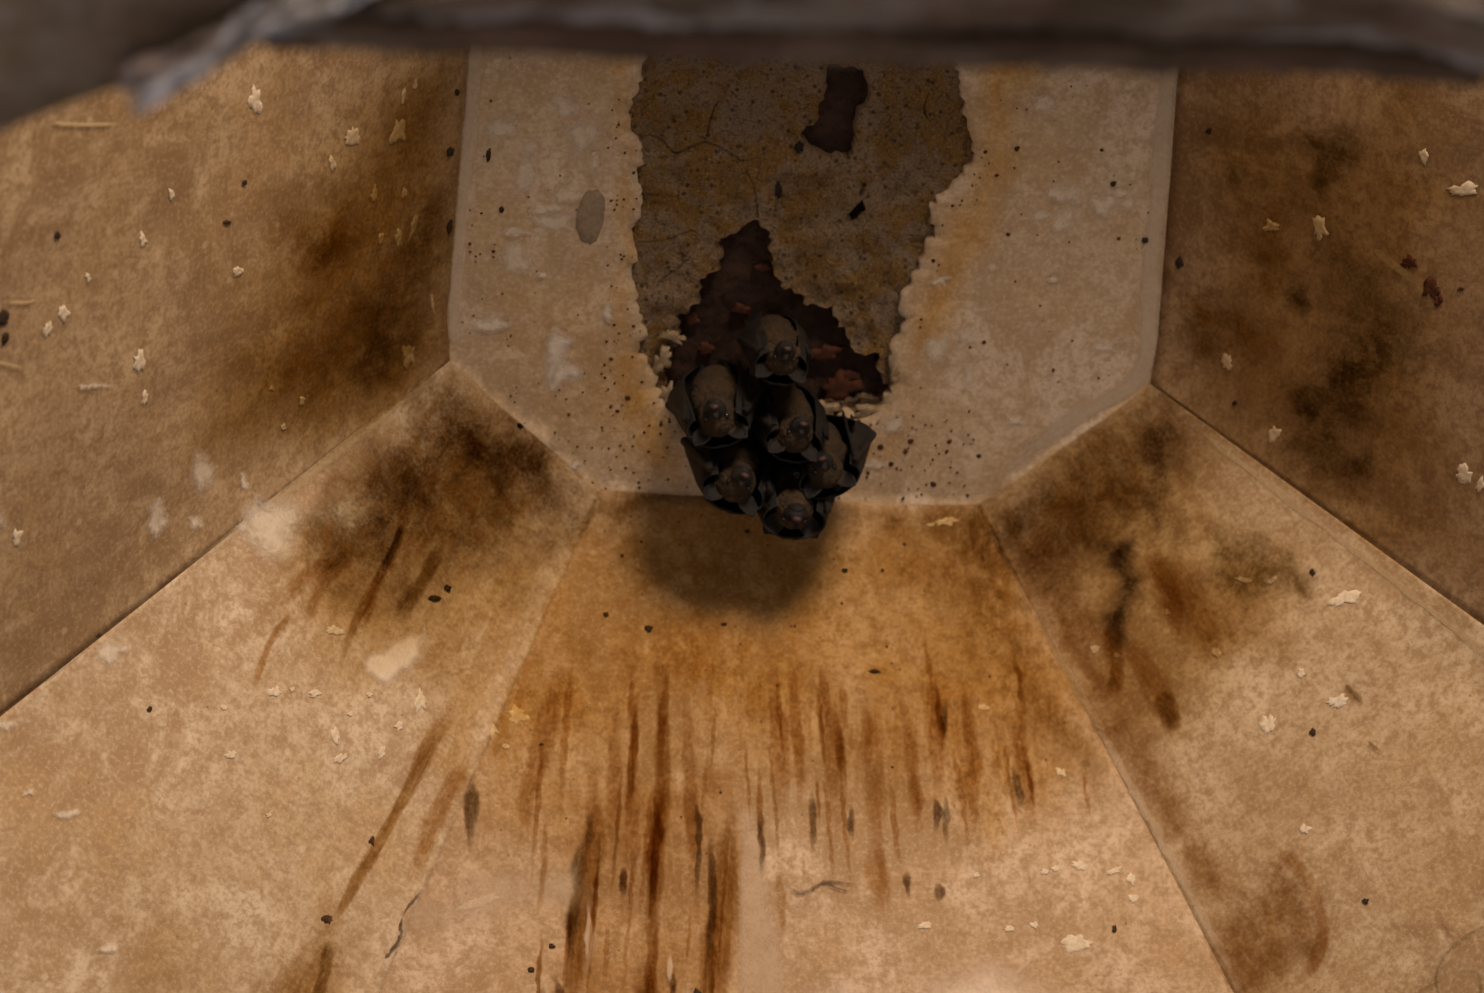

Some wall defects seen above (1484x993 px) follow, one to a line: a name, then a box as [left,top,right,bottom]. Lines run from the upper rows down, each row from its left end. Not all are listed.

flaking render [628,57,975,432]
leakage [322,392,546,589]
leakage [428,584,451,602]
leakage [1108,543,1136,654]